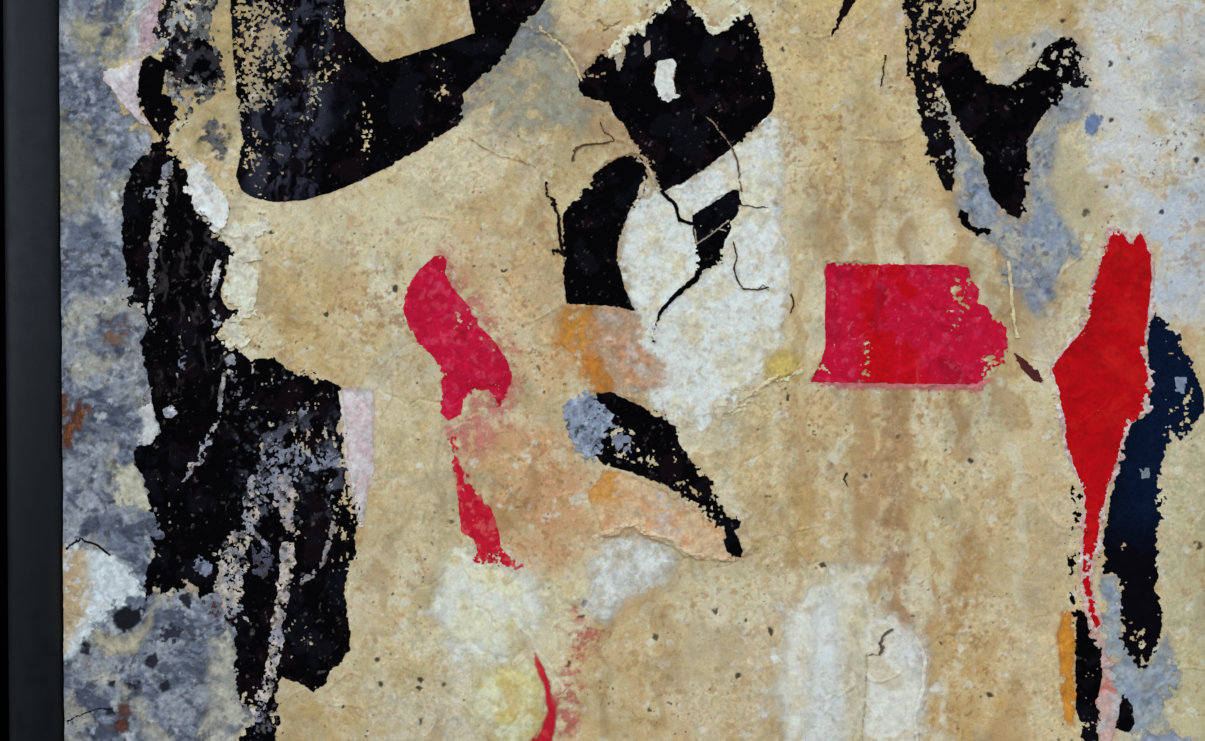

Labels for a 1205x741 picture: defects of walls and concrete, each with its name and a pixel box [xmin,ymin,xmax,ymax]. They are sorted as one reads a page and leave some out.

crack [468,137,566,256]
crack [571,117,794,342]